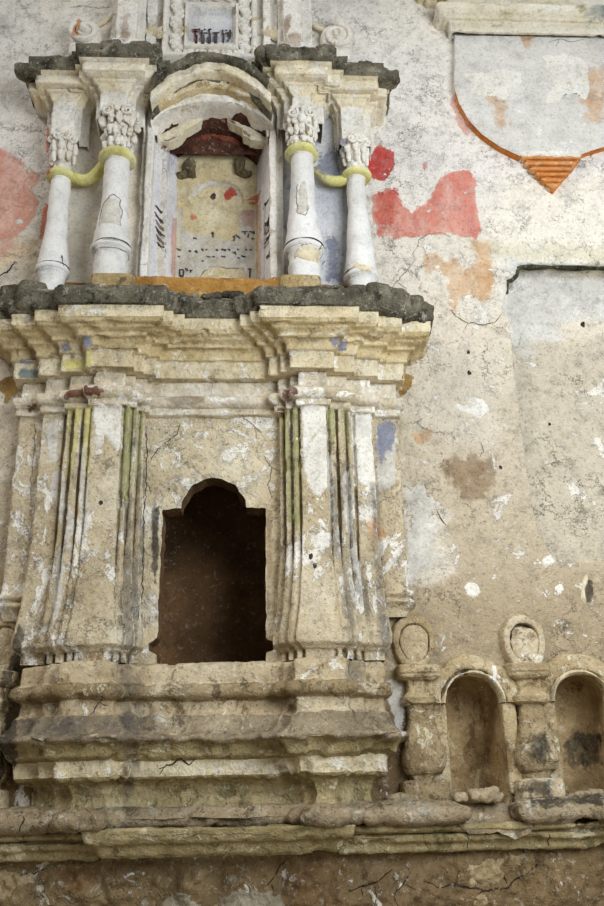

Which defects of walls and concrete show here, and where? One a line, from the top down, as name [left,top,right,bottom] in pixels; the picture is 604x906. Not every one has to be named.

peeling [464,67,525,102]
peeling [543,53,590,107]
peeling [58,335,94,374]
peeling [45,404,145,625]
crack [159,758,195,774]
leakage [564,732,602,764]
crack [349,834,550,906]